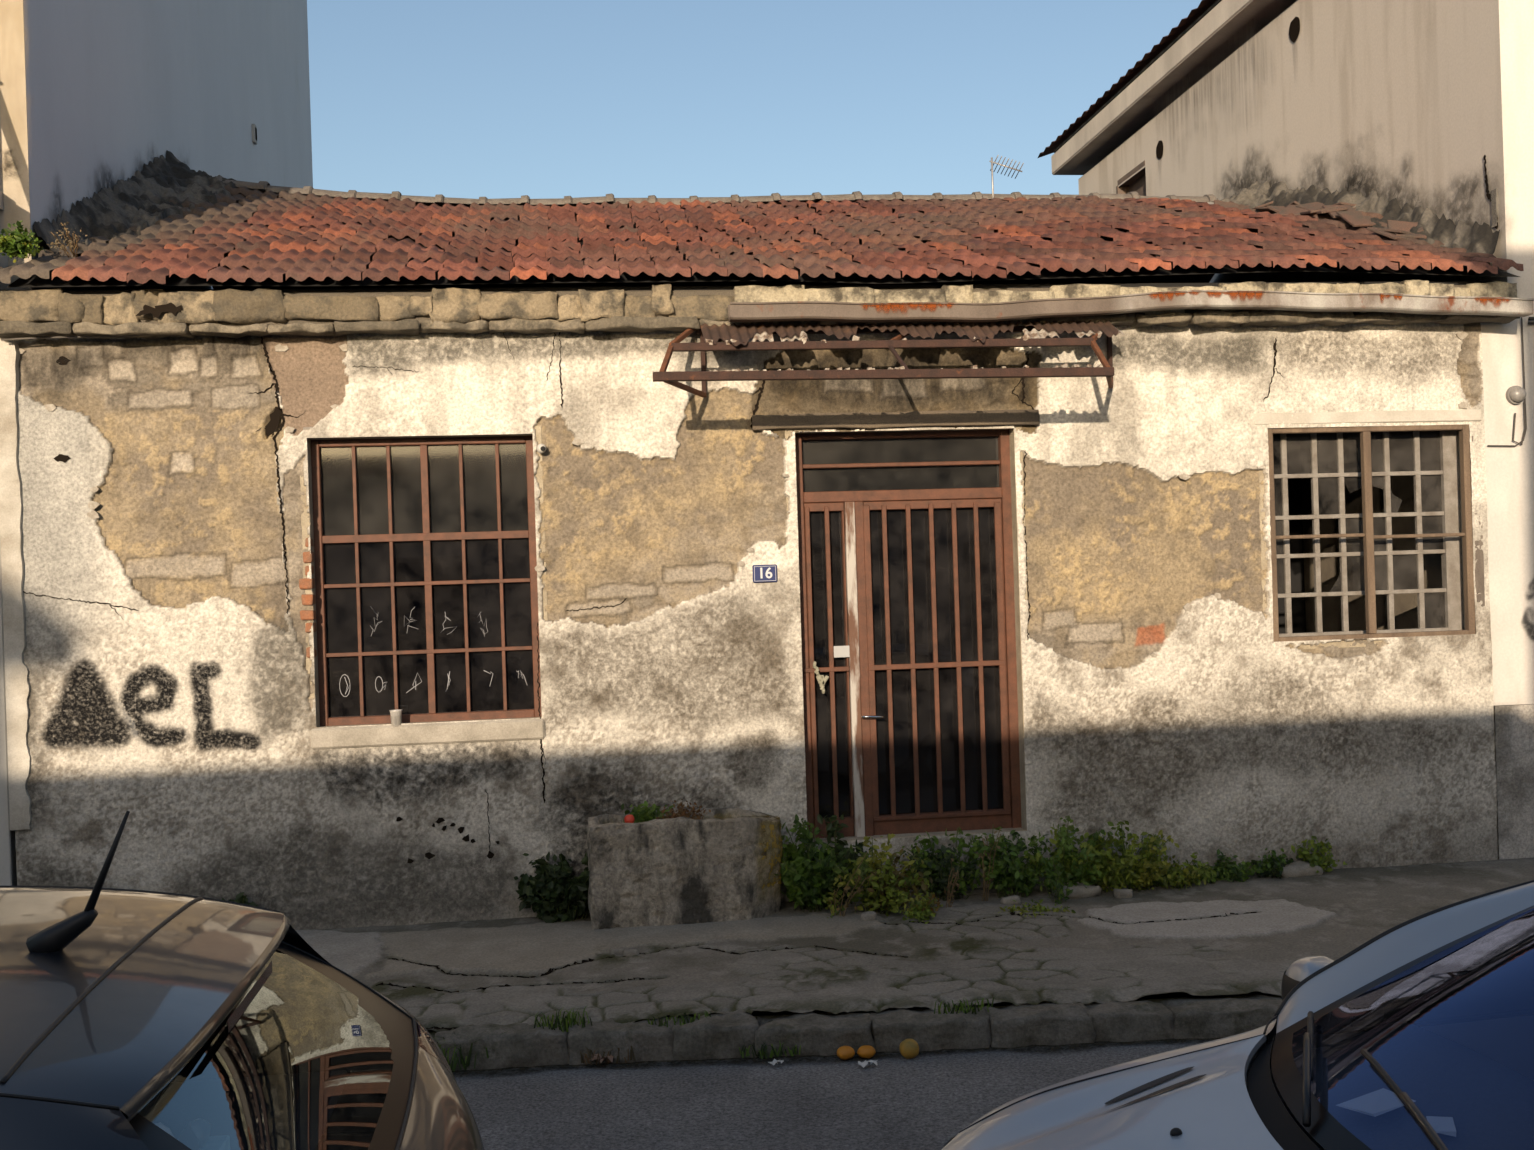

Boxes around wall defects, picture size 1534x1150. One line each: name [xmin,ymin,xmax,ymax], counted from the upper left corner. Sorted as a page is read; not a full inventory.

damp [1227,165,1278,195]
damp [1316,167,1416,210]
damp [1449,182,1478,227]
peeling [17,335,349,711]
crack [248,337,304,614]
peeling [534,337,1043,627]
peeling [1021,450,1271,668]